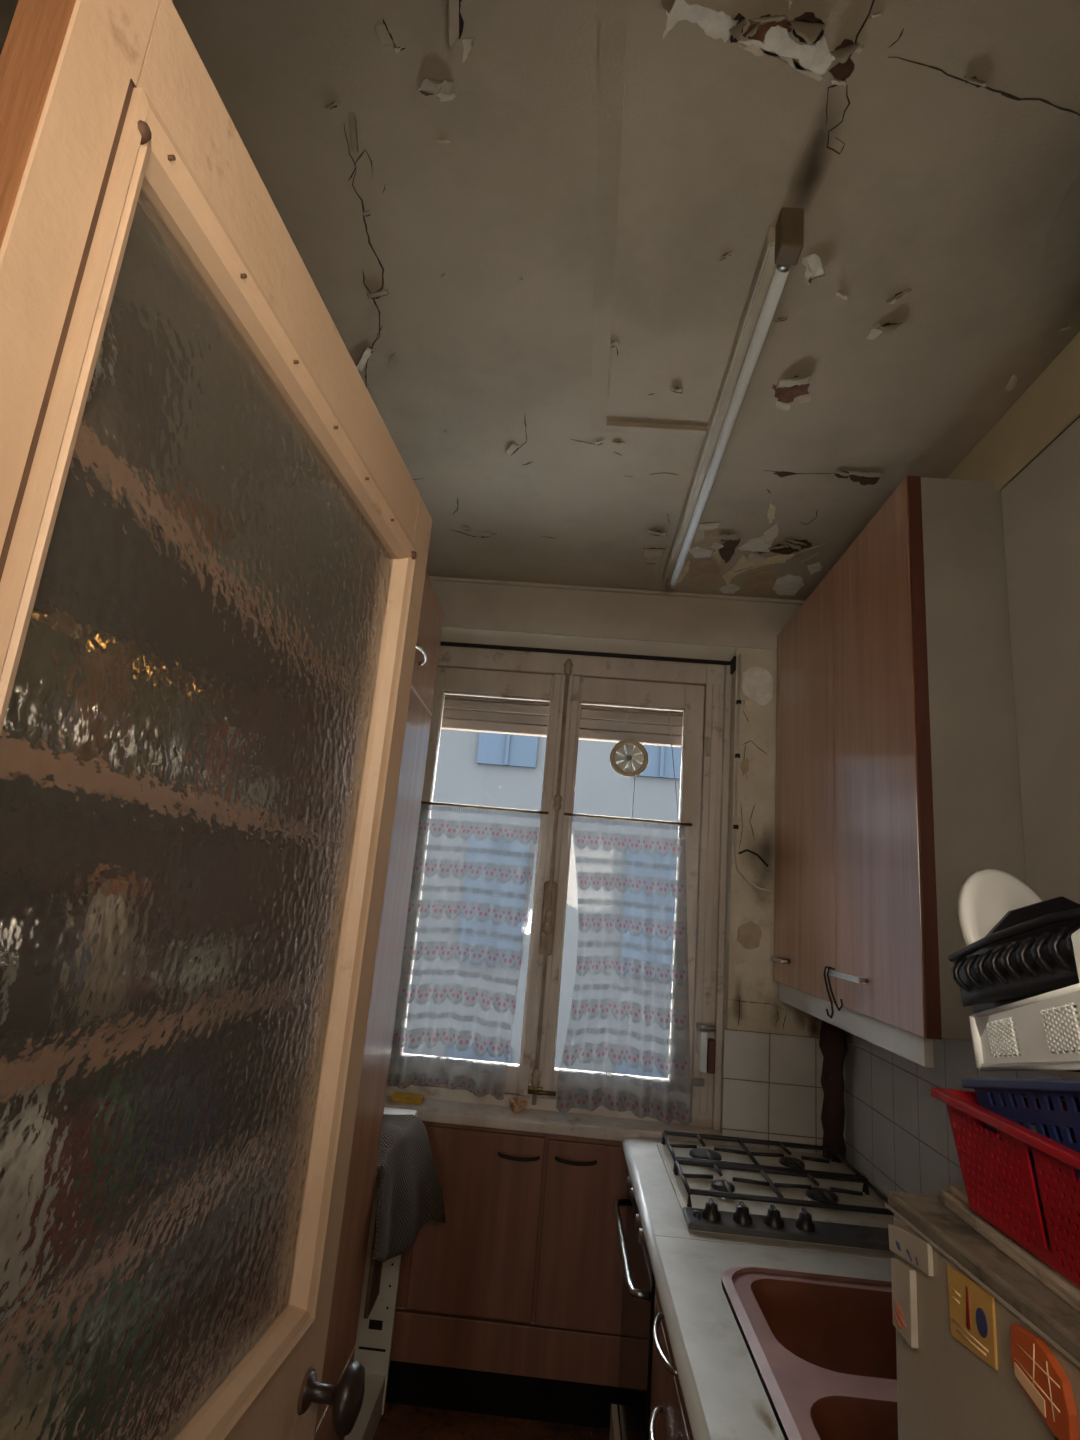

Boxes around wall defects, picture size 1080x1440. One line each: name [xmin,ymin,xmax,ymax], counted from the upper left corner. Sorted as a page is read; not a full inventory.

peeling [448,0,475,63]
peeling [661,0,859,81]
crack [826,0,1080,155]
crack [324,101,396,388]
peeling [801,254,826,285]
flaking render [772,375,812,411]
peeling [677,489,825,596]